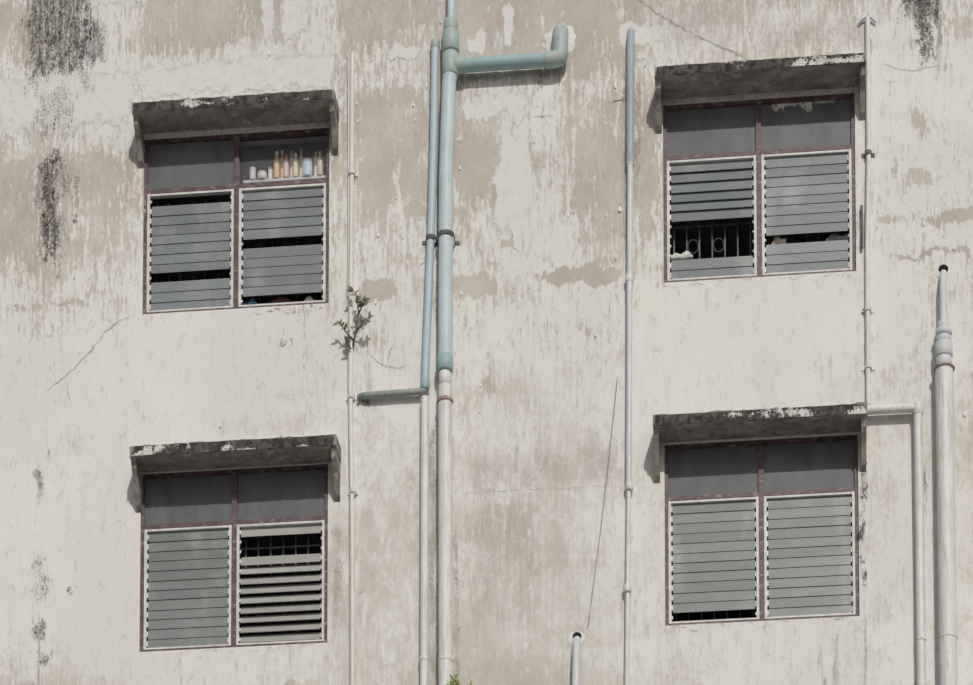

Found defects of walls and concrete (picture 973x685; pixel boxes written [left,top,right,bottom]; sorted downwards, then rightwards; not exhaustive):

peeling [456,0,650,89]
crack [639,0,749,60]
leakage [897,0,944,71]
leakage [0,0,332,280]
peeling [454,129,500,213]
peeling [511,109,661,289]
peeling [453,270,496,303]
crack [49,316,132,398]